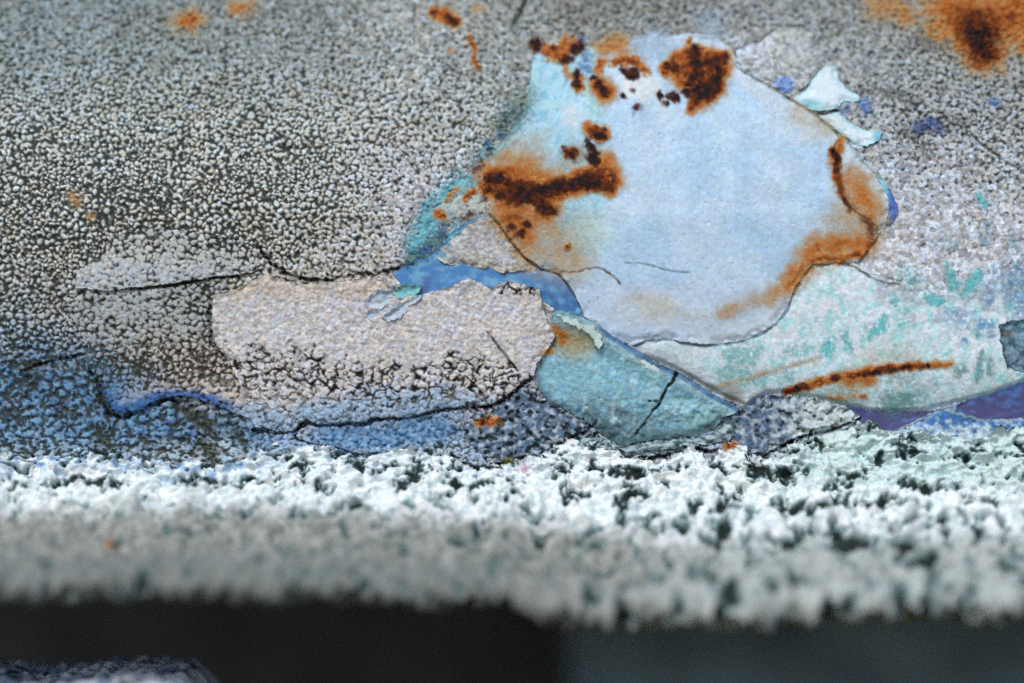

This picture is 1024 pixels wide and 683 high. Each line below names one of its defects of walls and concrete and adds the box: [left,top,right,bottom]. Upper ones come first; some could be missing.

rust [529,32,734,116]
rust [864,0,1024,79]
crack [130,246,414,290]
peeling [63,26,898,446]
rust [433,120,624,275]
rust [718,135,886,318]
crack [24,342,176,418]
crack [251,337,528,458]
crack [450,452,525,471]
crack [556,372,861,473]
rust [783,359,954,402]
spalling [998,320,1024,373]